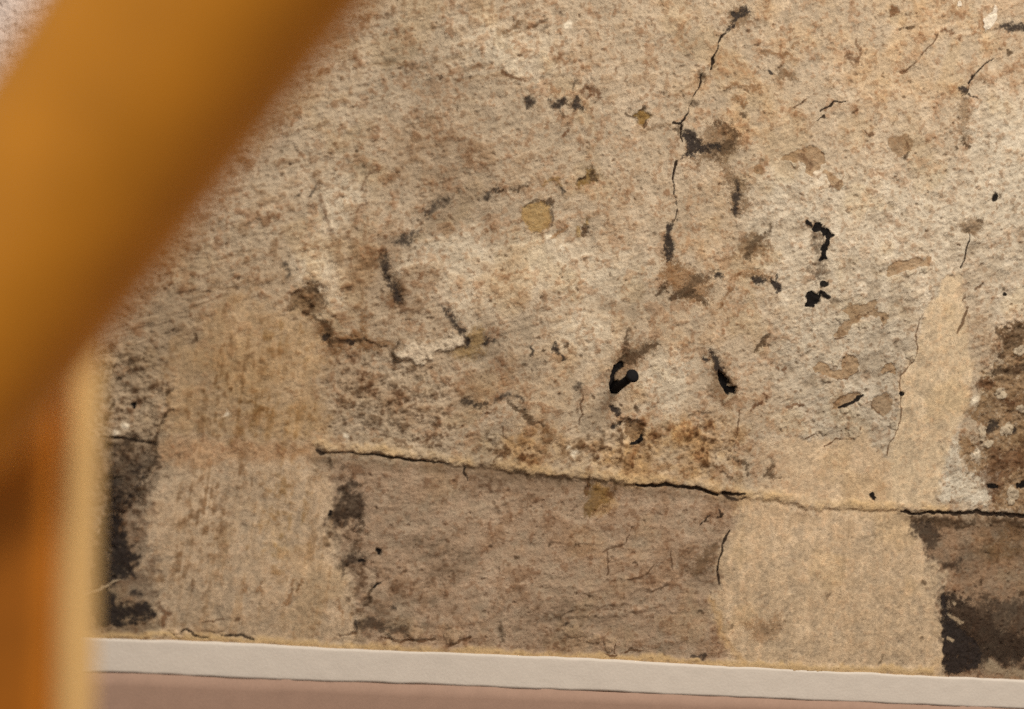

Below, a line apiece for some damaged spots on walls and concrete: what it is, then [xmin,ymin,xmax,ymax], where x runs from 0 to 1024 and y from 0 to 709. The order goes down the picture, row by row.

crack [672,33,726,221]
peeling [805,220,834,262]
peeling [805,280,831,308]
hole [702,348,740,407]
crack [315,449,468,481]
crack [901,509,1024,531]
damp [910,519,962,570]